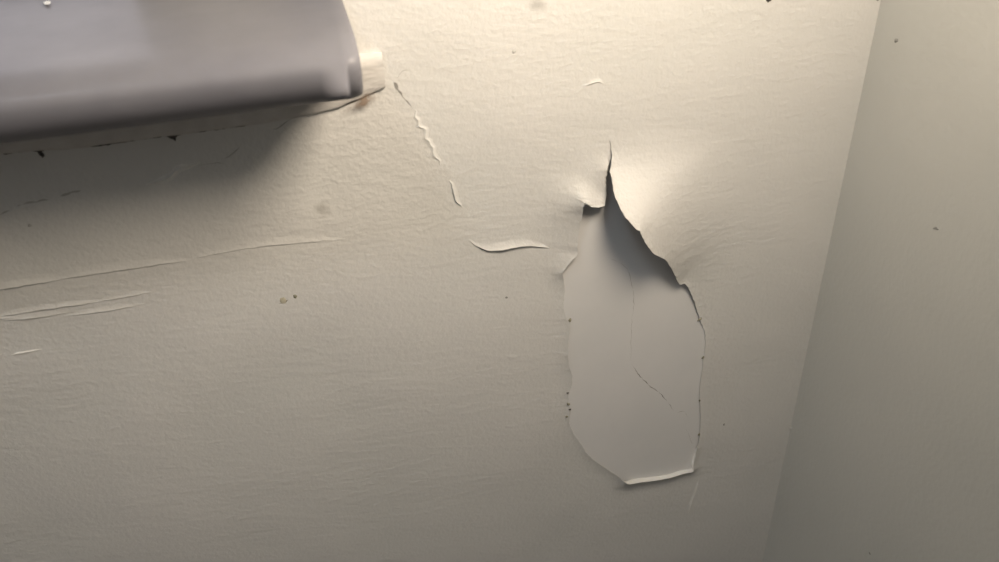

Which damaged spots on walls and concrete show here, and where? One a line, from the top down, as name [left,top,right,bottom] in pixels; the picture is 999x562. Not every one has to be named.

crack [155,126,244,141]
peeling [447,128,802,544]